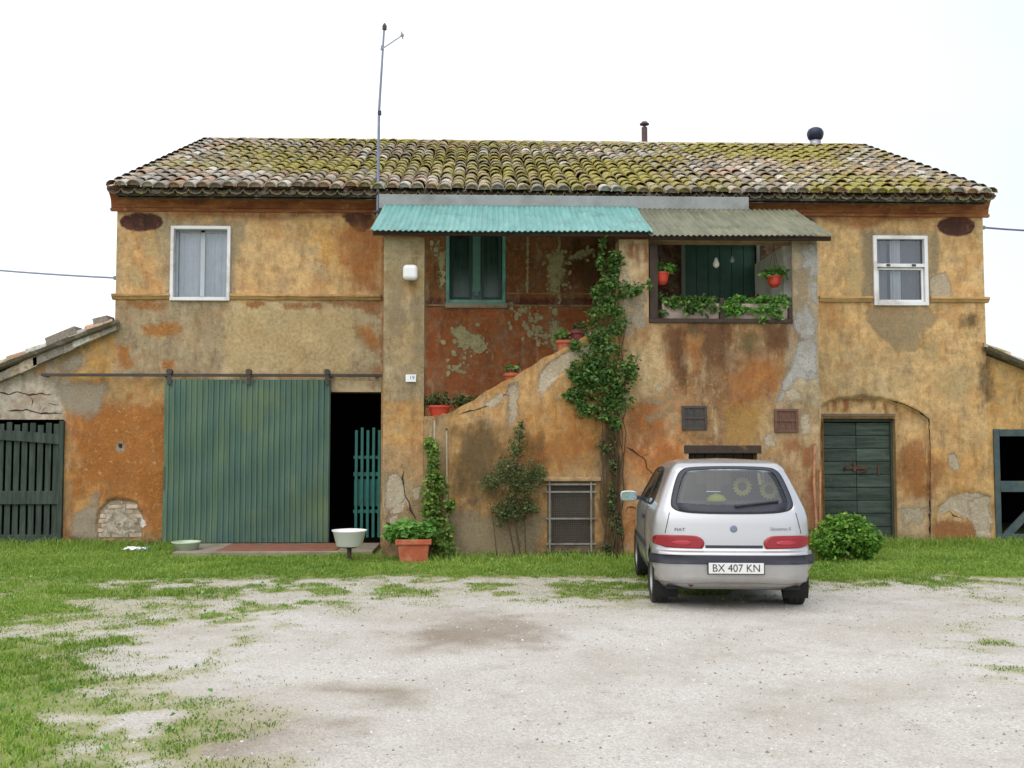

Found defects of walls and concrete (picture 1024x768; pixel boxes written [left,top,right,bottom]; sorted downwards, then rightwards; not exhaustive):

peeling [430,240,446,289]
flaking render [508,245,610,397]
flaking render [778,244,819,404]
peeling [440,323,494,377]
crack [0,391,60,414]
flaking render [799,413,811,434]
flaking render [89,491,148,542]
flaking render [384,473,421,525]
crack [399,472,416,519]
flaking render [898,492,993,541]